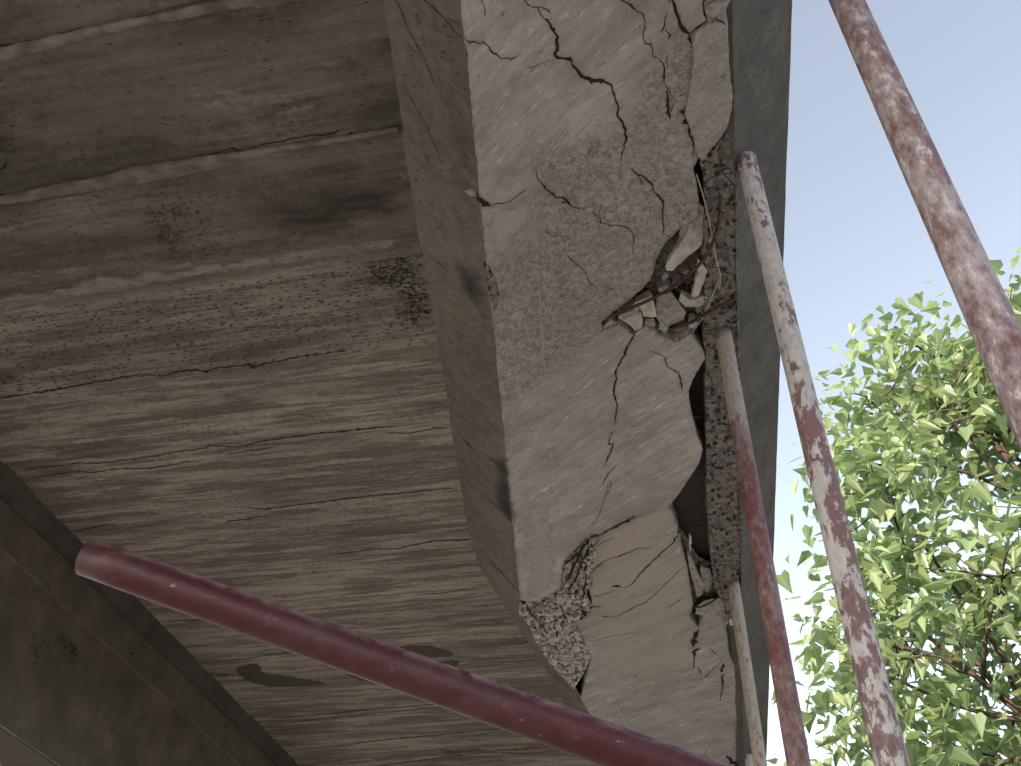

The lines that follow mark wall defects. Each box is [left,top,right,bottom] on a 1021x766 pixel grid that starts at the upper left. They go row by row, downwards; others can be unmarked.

crack [622,0,726,152]
crack [0,347,361,399]
crack [544,229,614,291]
spalling [602,0,743,668]
crack [589,308,683,641]
spalling [519,534,597,689]